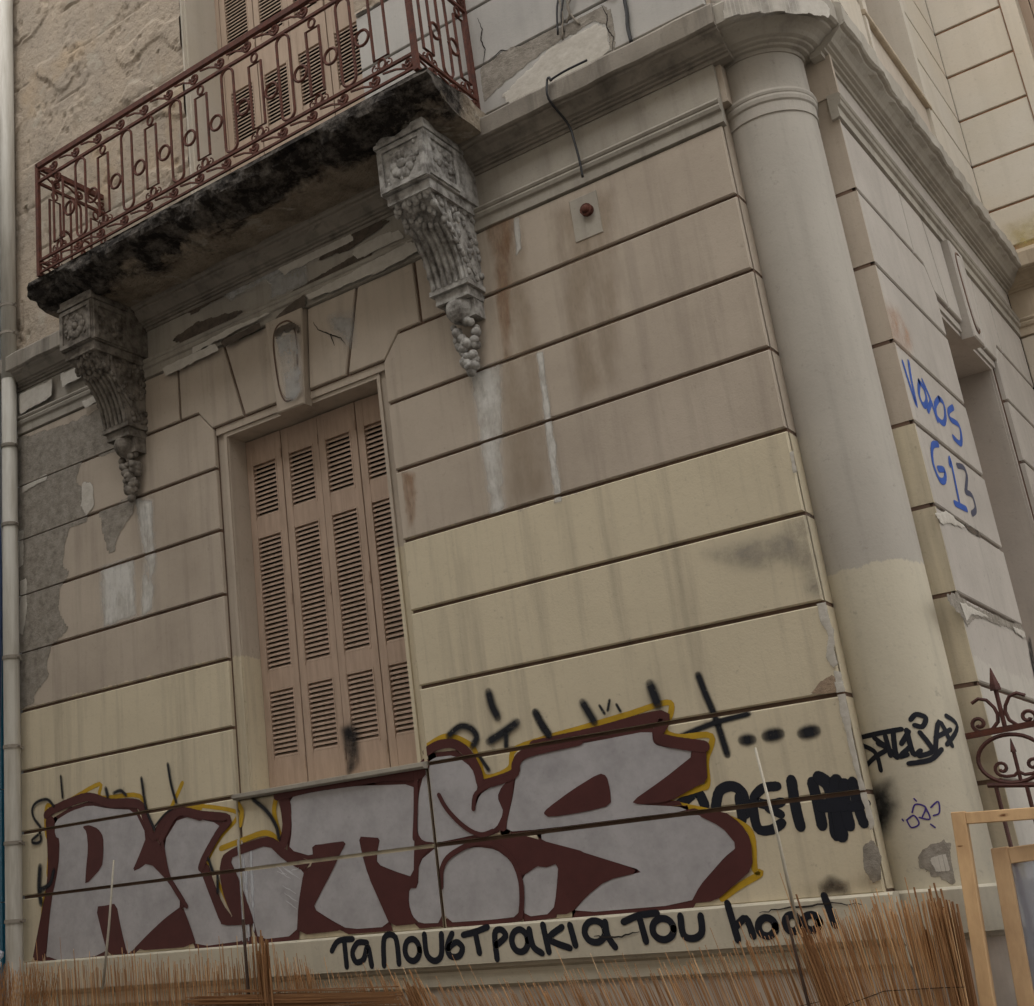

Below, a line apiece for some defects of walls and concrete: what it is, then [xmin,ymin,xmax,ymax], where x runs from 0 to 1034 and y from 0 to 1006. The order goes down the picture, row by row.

flaking render [480,6,616,103]
peeling [163,220,418,376]
peeling [19,368,81,414]
leakage [473,367,503,512]
leakage [537,352,561,502]
flaking render [17,397,137,710]